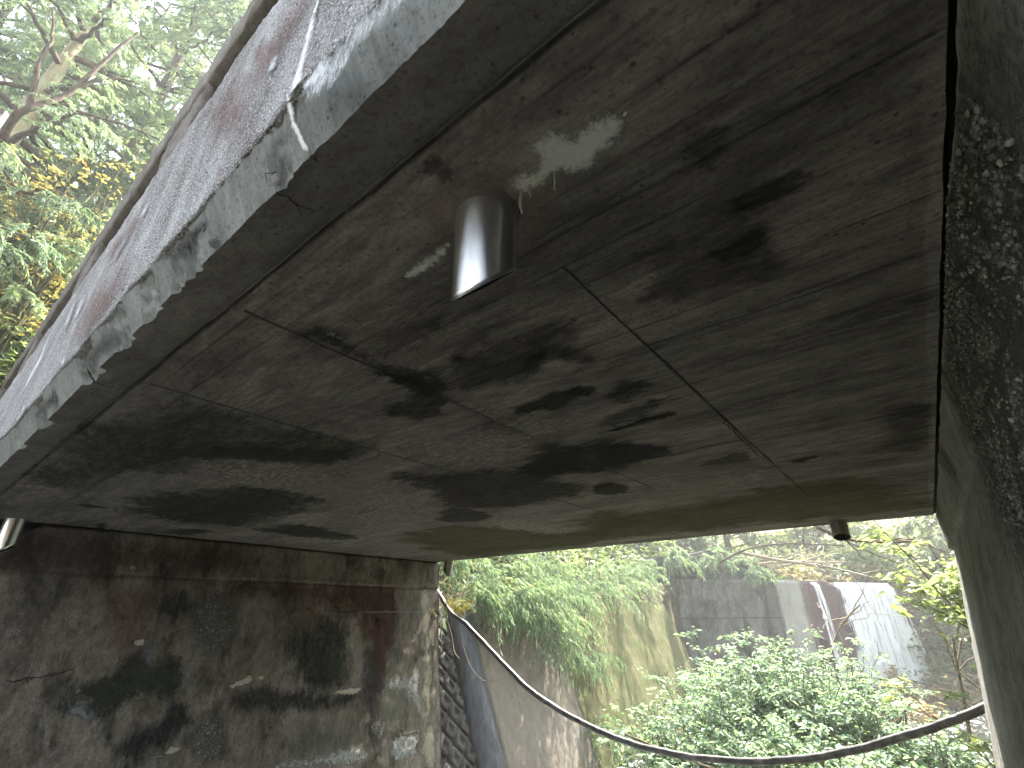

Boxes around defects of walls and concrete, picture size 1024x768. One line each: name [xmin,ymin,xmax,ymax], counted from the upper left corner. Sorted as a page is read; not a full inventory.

damp [423,111,628,256]
damp [405,243,450,278]
damp [306,320,593,421]
damp [387,380,676,522]
crack [4,643,90,684]
damp [228,617,387,768]